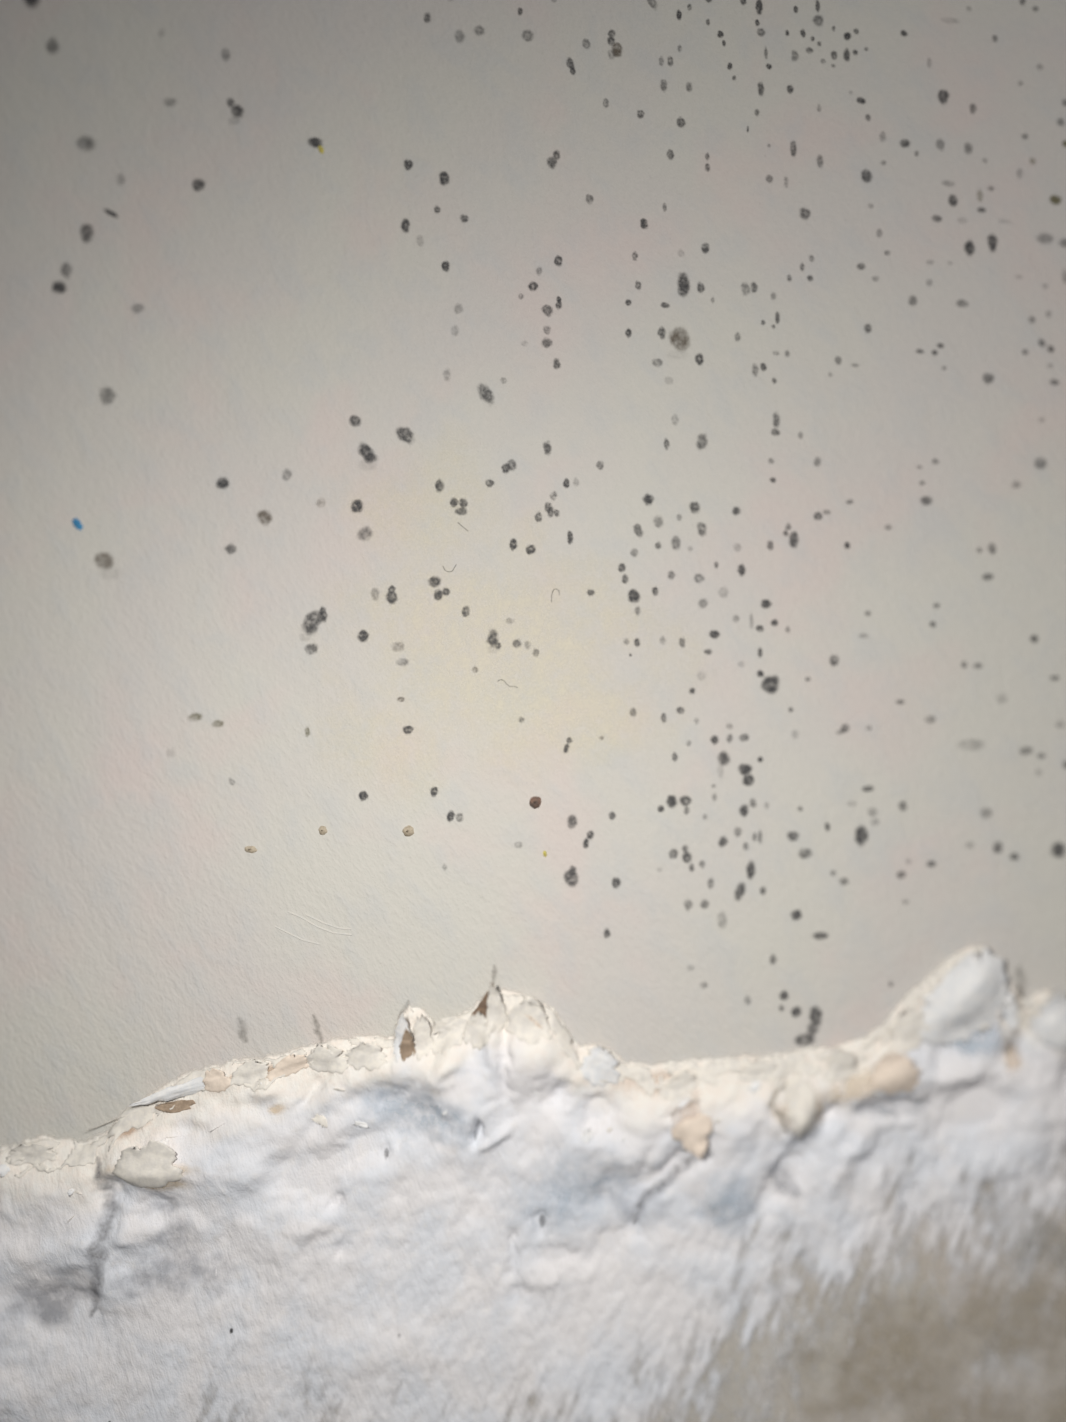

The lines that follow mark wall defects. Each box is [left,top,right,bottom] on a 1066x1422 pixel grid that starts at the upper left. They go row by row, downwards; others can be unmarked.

damp [965,235,997,255]
damp [662,274,704,307]
damp [360,445,375,462]
damp [619,564,657,613]
damp [305,608,327,650]
mould [758,649,778,692]
mould [711,735,763,816]
damp [658,796,691,813]
damp [856,827,867,844]
damp [735,863,765,900]
peeling [0,946,1066,1188]
damp [0,945,1066,1422]